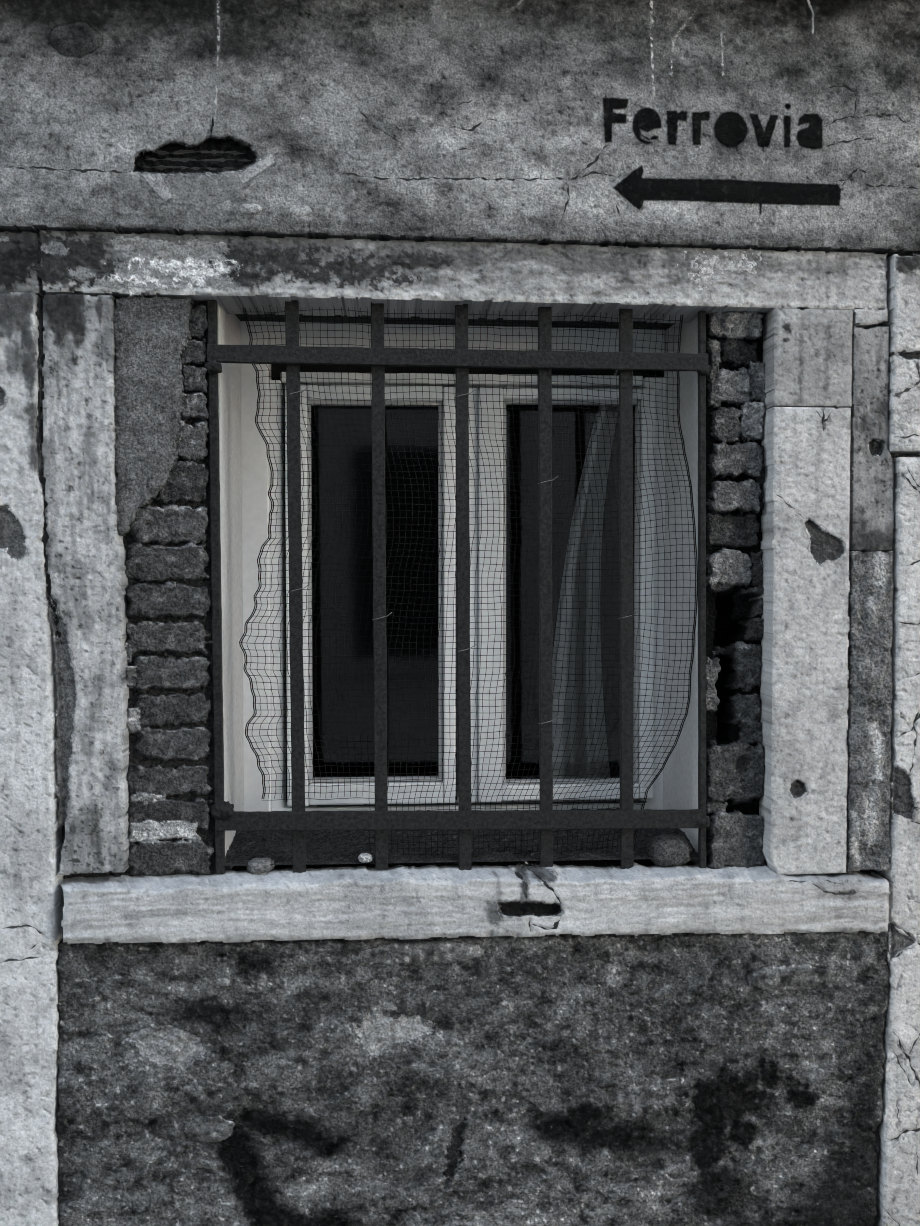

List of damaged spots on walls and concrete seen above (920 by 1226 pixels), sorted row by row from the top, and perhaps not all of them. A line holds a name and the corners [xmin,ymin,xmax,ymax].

spalling [133,135,275,208]
crack [894,362,920,398]
crack [902,468,920,493]
flaking render [0,229,454,877]
spalling [805,519,846,565]
flaking render [706,311,766,869]
crack [897,711,920,775]
spalling [497,899,564,918]
crack [894,926,920,958]
crack [892,1032,920,1174]